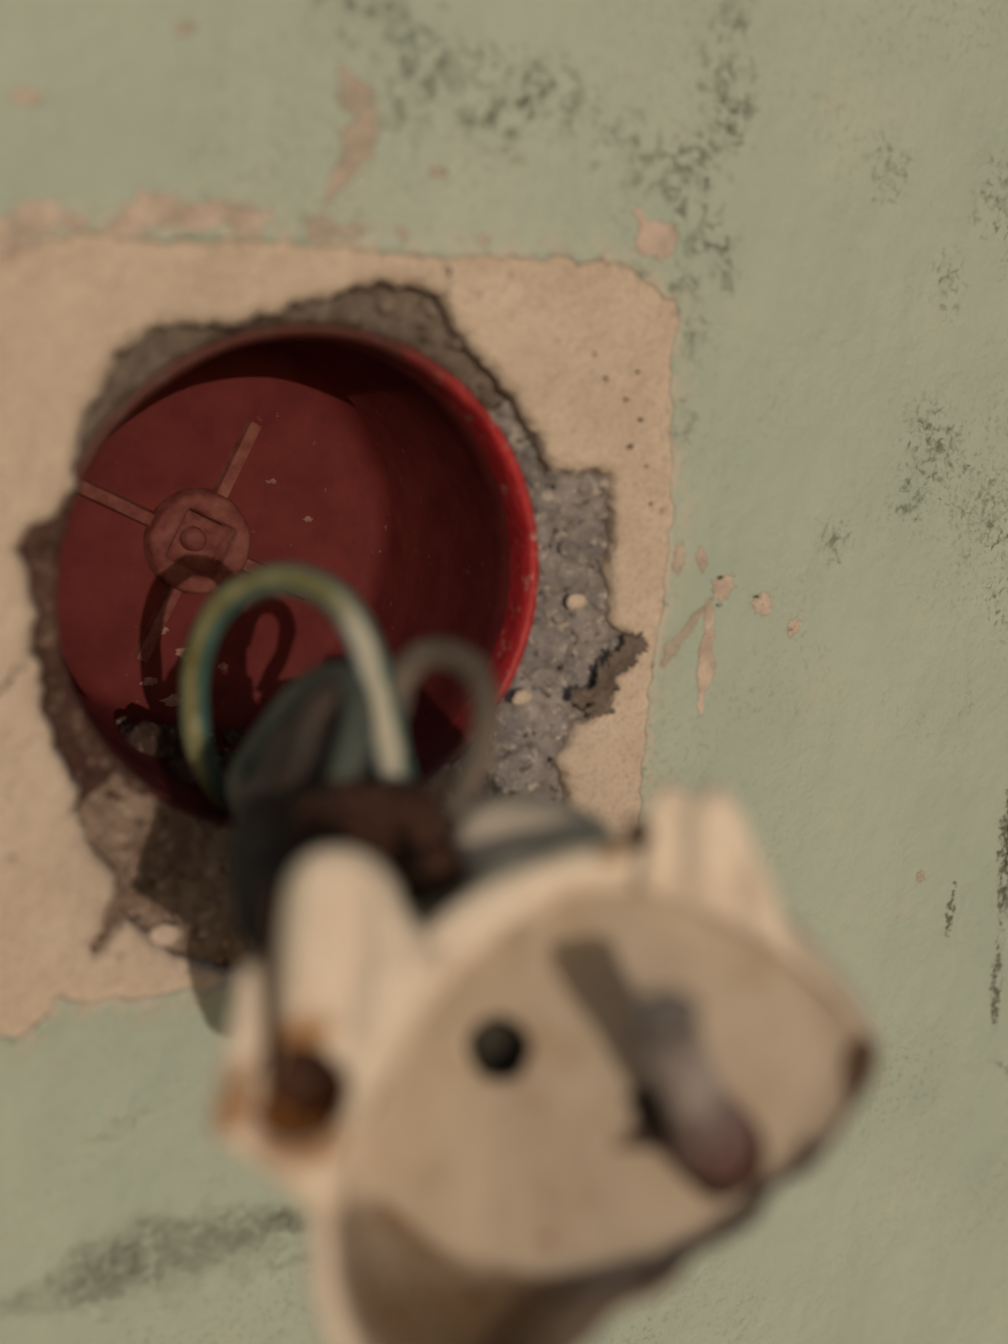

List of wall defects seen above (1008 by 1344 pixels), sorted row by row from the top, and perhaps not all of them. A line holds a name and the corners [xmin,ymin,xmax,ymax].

peeling [633,206,678,262]
spalling [15,283,736,968]
crack [945,881,956,937]
crack [990,790,1008,1025]